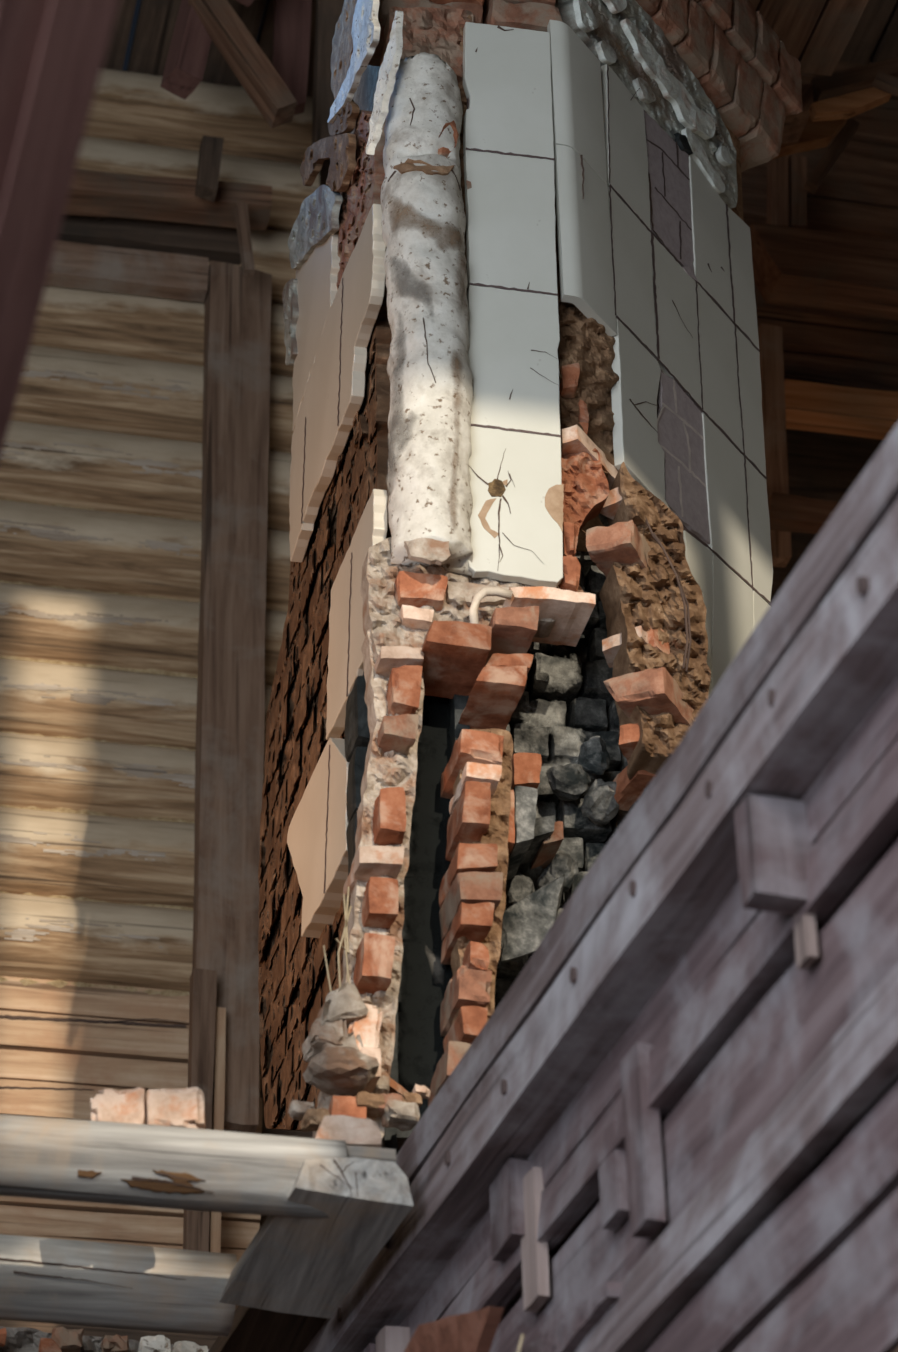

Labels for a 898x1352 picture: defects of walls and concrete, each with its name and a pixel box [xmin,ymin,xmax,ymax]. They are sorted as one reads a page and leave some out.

peeling [282,0,461,366]
spalling [404,538,450,566]
crack [469,449,544,565]
spalling [657,371,710,545]